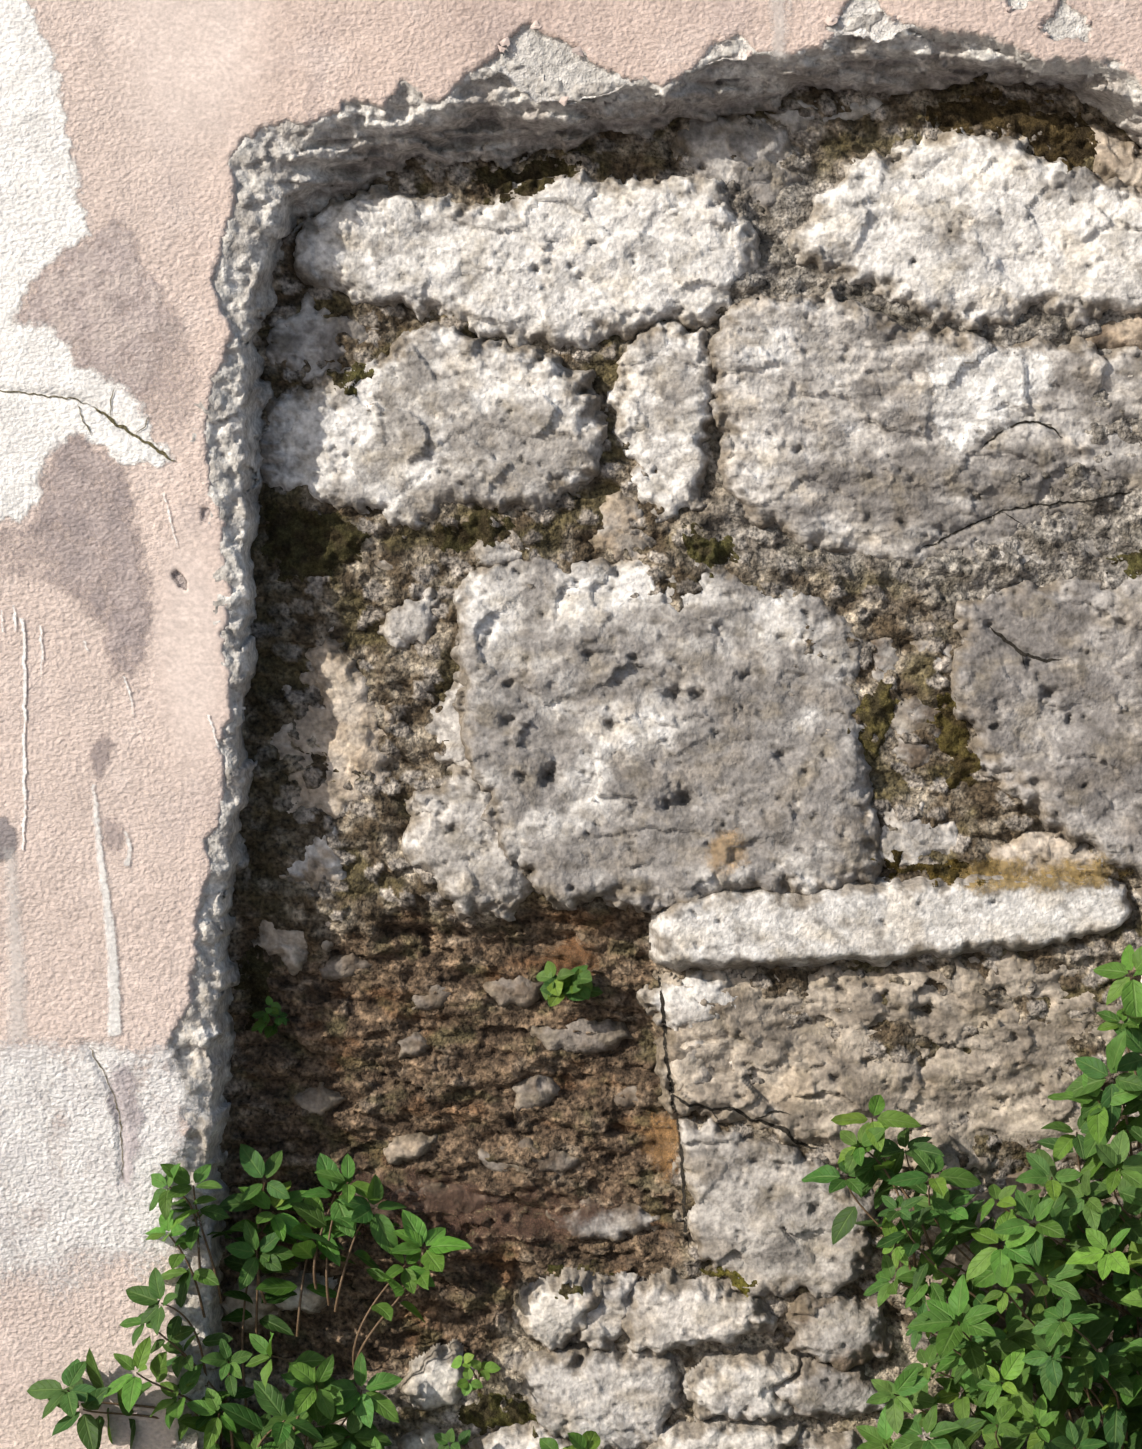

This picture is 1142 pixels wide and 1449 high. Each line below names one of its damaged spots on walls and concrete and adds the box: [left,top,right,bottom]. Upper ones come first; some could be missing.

spalling [498,21,615,103]
spalling [715,48,753,61]
spalling [824,0,907,43]
spalling [1038,0,1093,42]
peeling [0,0,174,523]
water stain [16,219,195,422]
crack [0,386,175,461]
crack [979,420,1061,451]
water stain [0,434,150,673]
spalling [172,570,187,590]
crack [919,490,1135,551]
crack [658,970,817,1247]